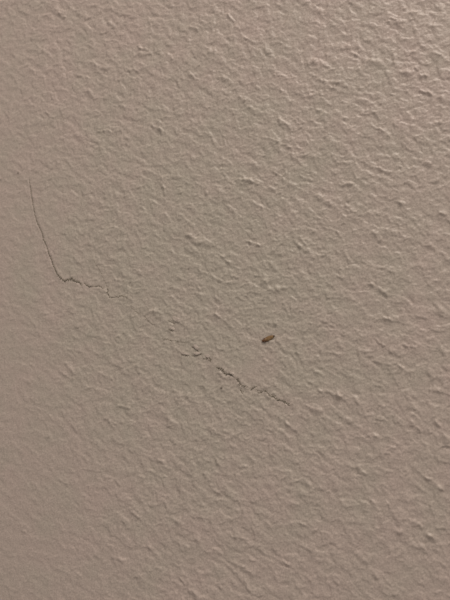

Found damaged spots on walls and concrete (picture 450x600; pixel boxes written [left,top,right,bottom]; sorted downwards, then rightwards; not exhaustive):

crack [29,179,290,406]